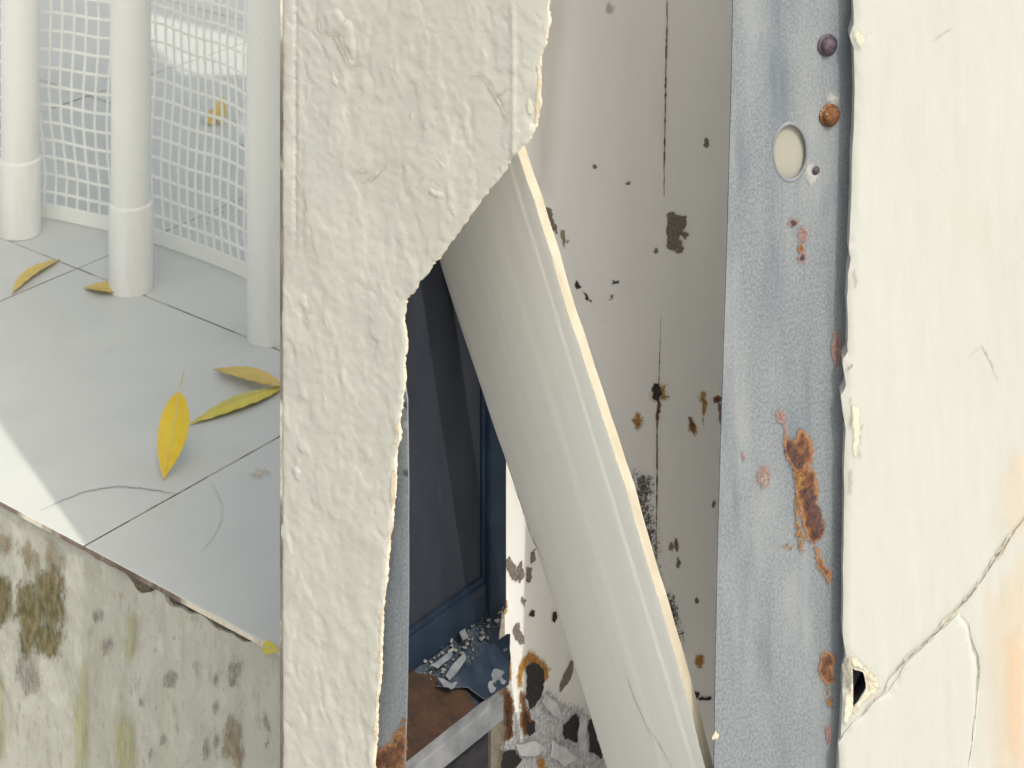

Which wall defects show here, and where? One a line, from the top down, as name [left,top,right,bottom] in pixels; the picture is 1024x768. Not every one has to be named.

peeling [653,212,690,254]
corrosion [632,383,668,431]
corrosion [688,391,721,435]
leakage [632,469,666,581]
corrosion [775,408,832,584]
leakage [0,538,66,696]
leakage [667,593,685,641]
crack [862,518,1024,765]
corrosion [376,718,408,768]
peeling [501,660,607,768]
corrosion [818,652,837,707]
spalling [842,657,880,723]